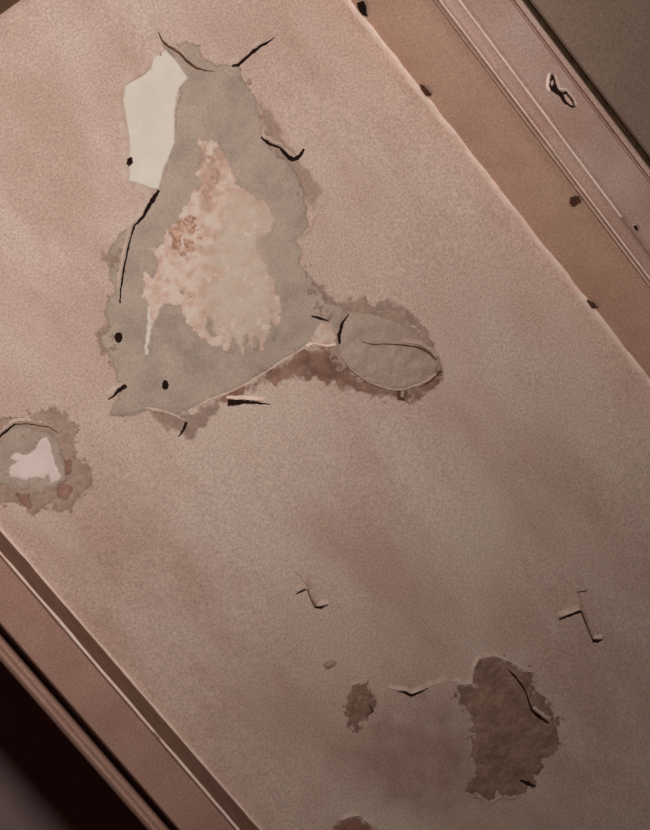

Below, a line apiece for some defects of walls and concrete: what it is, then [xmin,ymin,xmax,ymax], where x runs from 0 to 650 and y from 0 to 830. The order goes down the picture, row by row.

crack [231,33,275,67]
crack [261,132,305,161]
peeling [97,29,342,438]
peeling [0,407,92,516]
crack [296,589,328,609]
crack [559,590,603,643]
peeling [343,677,379,733]
crack [387,676,463,697]
peeling [451,651,564,806]
peeling [334,811,378,830]